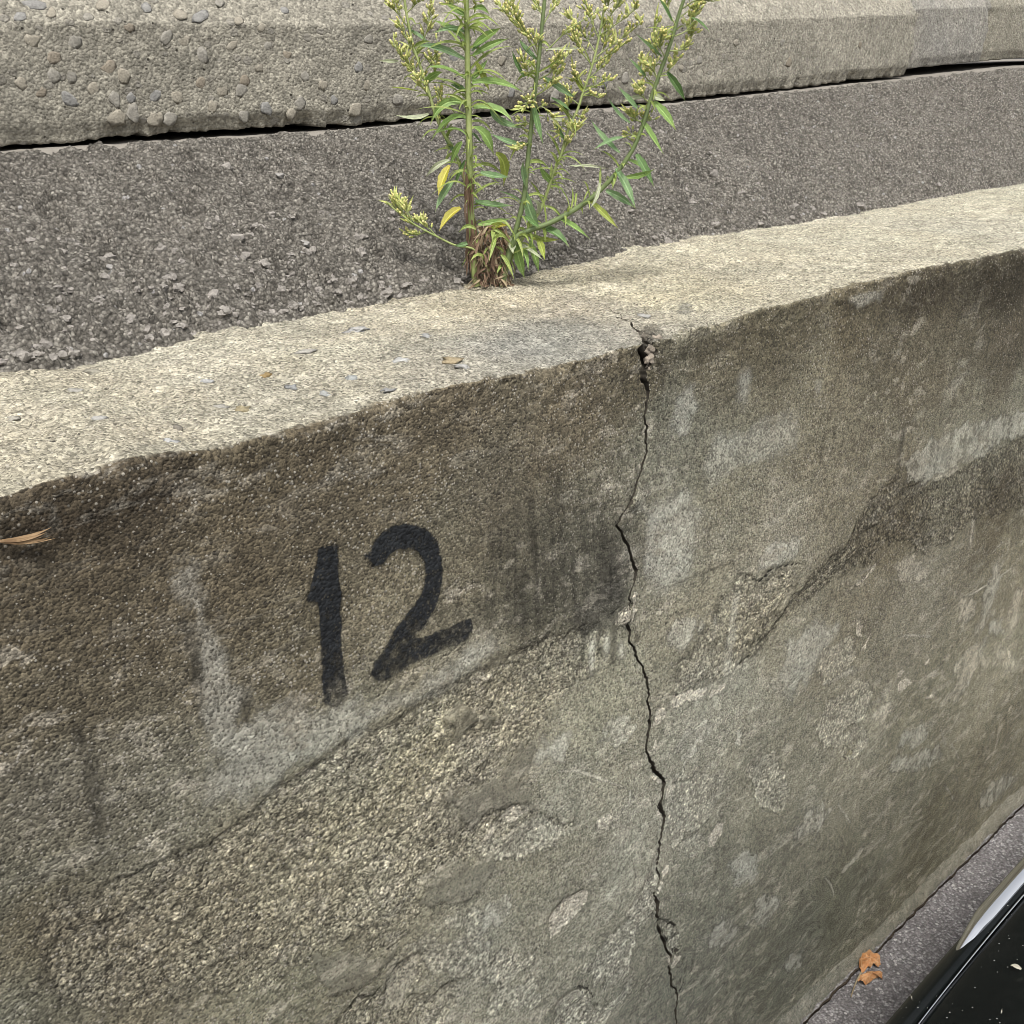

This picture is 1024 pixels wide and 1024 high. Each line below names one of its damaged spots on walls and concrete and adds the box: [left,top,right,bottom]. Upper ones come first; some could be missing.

crack [753,563,800,582]
damp [583,627,624,670]
crack [583,301,692,1024]